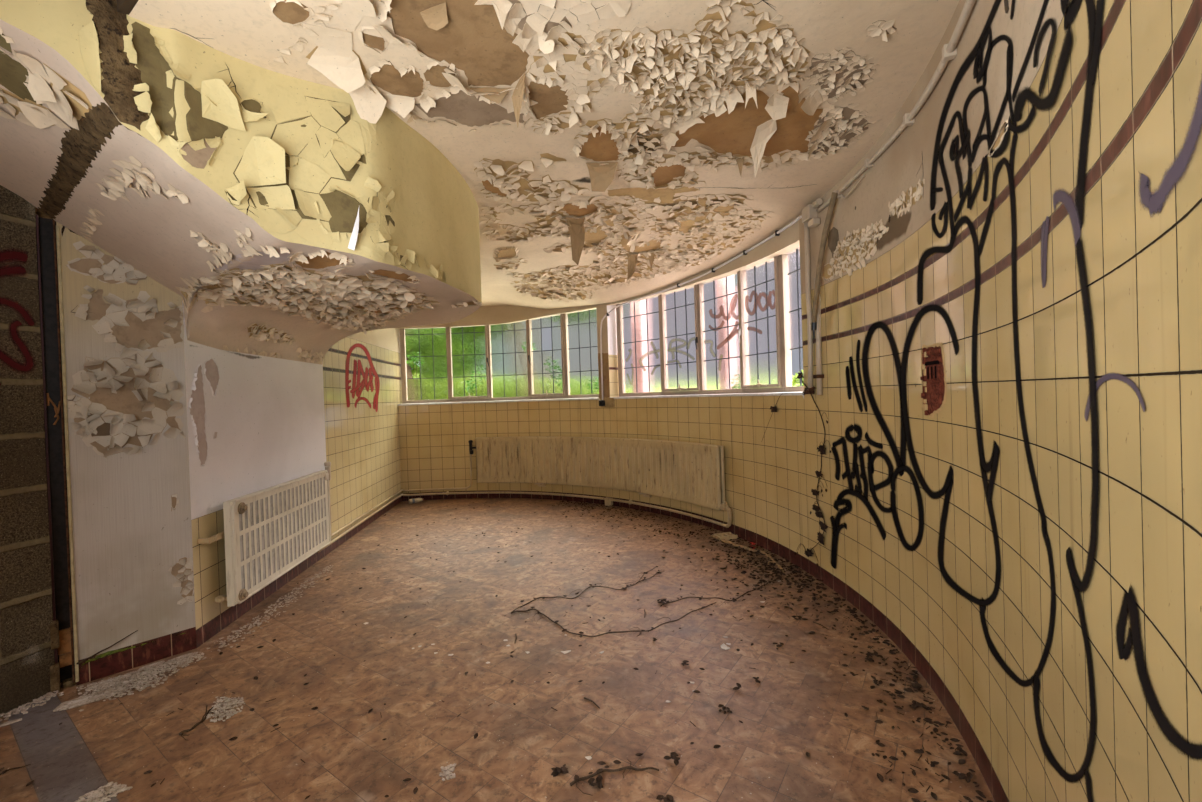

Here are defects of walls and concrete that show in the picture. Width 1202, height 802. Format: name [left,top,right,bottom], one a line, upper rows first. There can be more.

peeling [0,0,882,466]
peeling [822,179,925,281]